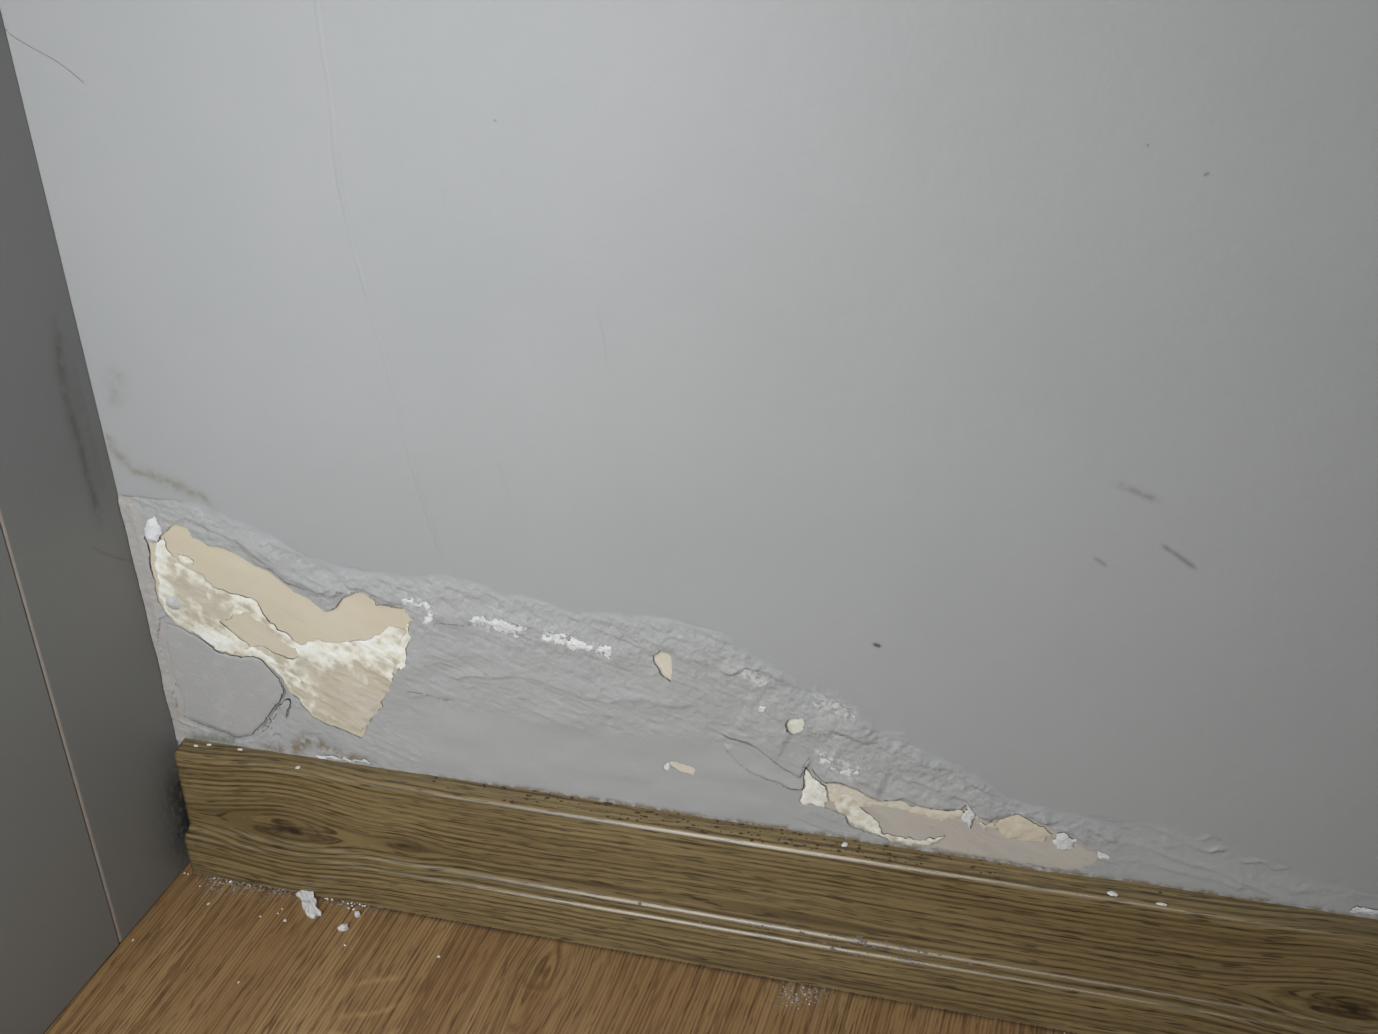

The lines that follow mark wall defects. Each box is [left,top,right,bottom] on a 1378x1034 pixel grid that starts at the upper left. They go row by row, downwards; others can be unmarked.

peeling [144,516,413,737]
peeling [653,651,672,682]
crack [723,731,852,790]
flaking render [799,767,1109,871]